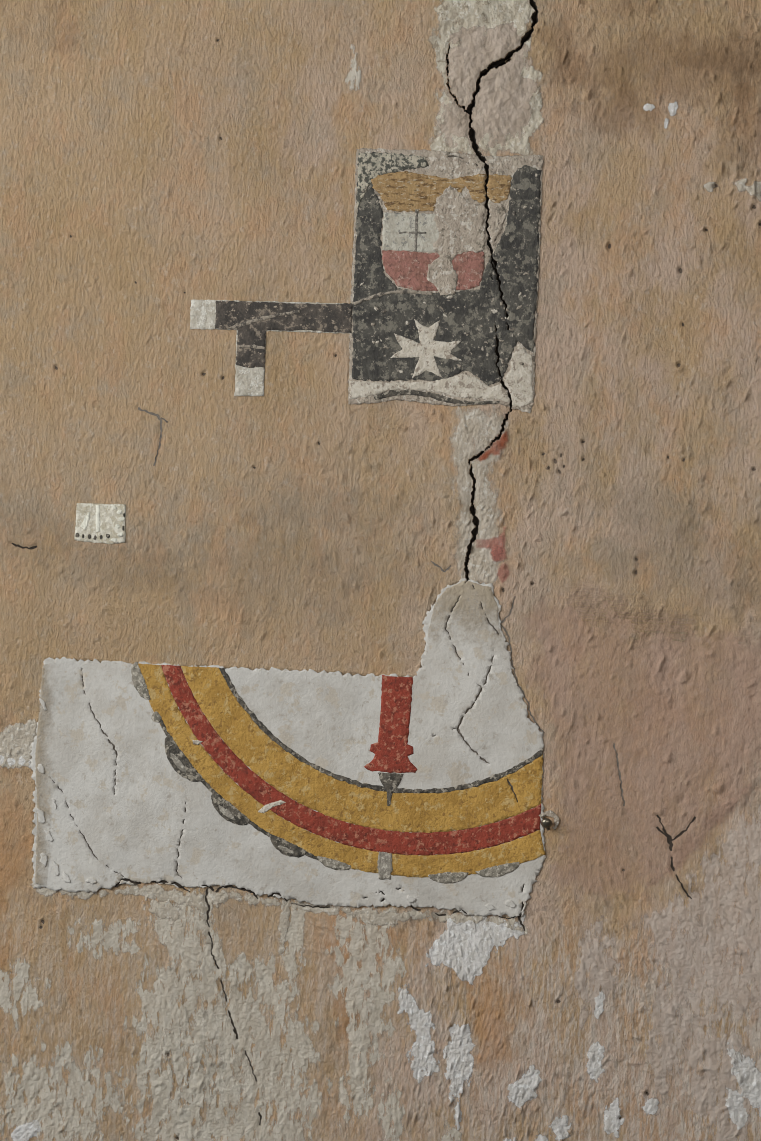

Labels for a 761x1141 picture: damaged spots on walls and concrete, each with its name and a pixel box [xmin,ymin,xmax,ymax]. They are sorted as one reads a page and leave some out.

peeling [429,0,543,156]
crack [431,0,544,802]
flaking render [0,406,560,1141]
crack [52,780,330,1082]
crack [363,888,467,916]
peeling [574,921,620,1027]
crack [656,815,696,899]
peeling [641,804,761,1141]
peeling [586,1041,605,1084]
peeling [534,1115,572,1141]
peeling [604,1097,624,1138]